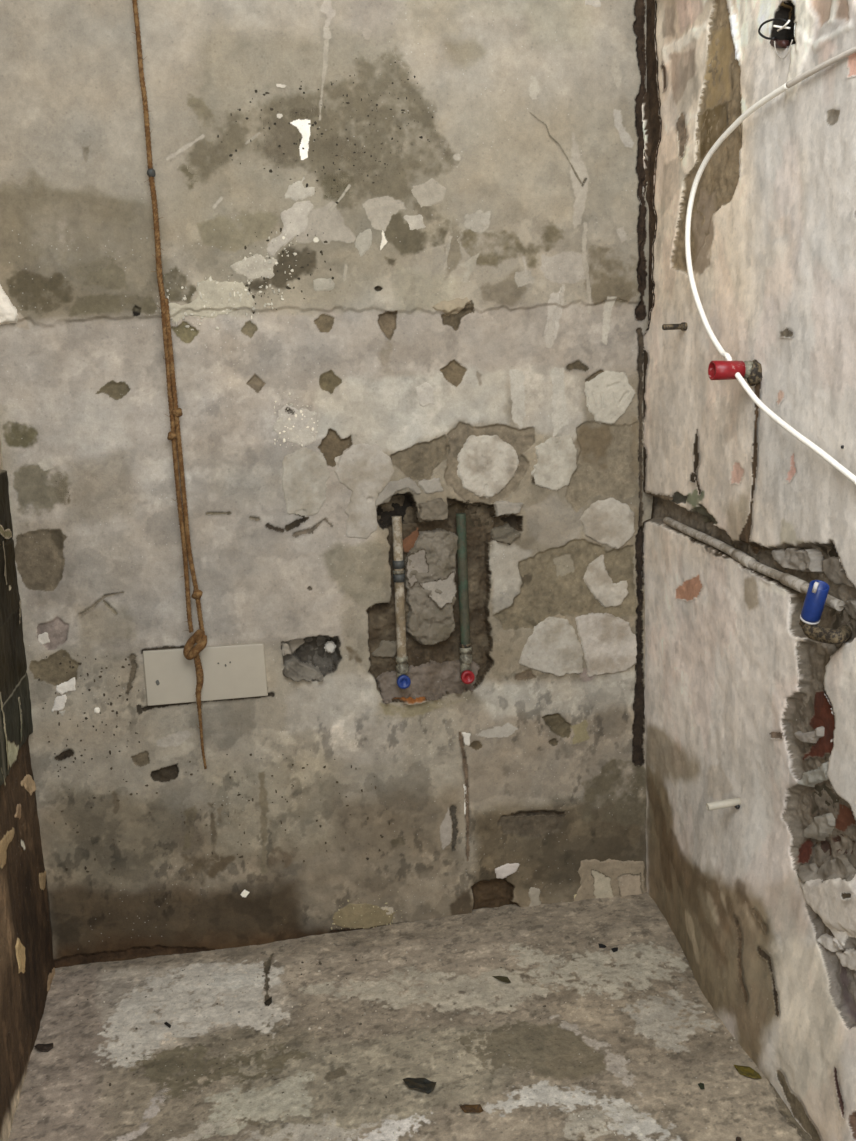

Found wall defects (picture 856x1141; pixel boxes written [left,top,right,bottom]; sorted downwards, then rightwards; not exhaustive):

spalling [276,113,311,161]
damp [0,42,571,331]
flaking render [361,178,447,250]
damp [581,241,640,308]
spalling [389,368,536,505]
spalling [550,366,639,513]
spalling [493,538,638,631]
spalling [280,635,363,683]
damp [159,754,305,888]
damp [578,757,647,831]
damp [331,895,402,930]
spalling [803,901,856,1031]